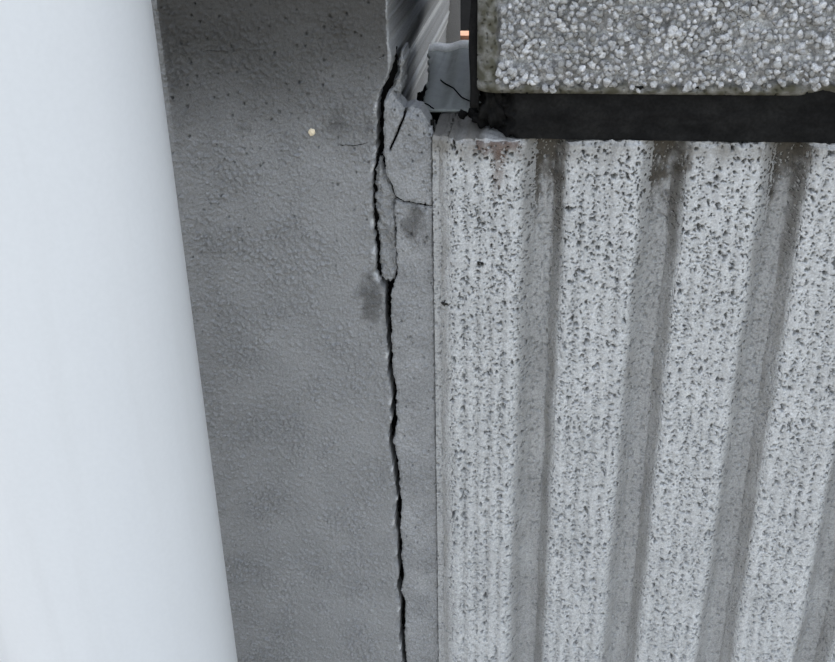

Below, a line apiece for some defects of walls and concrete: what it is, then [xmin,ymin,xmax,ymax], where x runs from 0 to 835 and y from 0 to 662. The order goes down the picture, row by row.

crack [341,46,432,648]